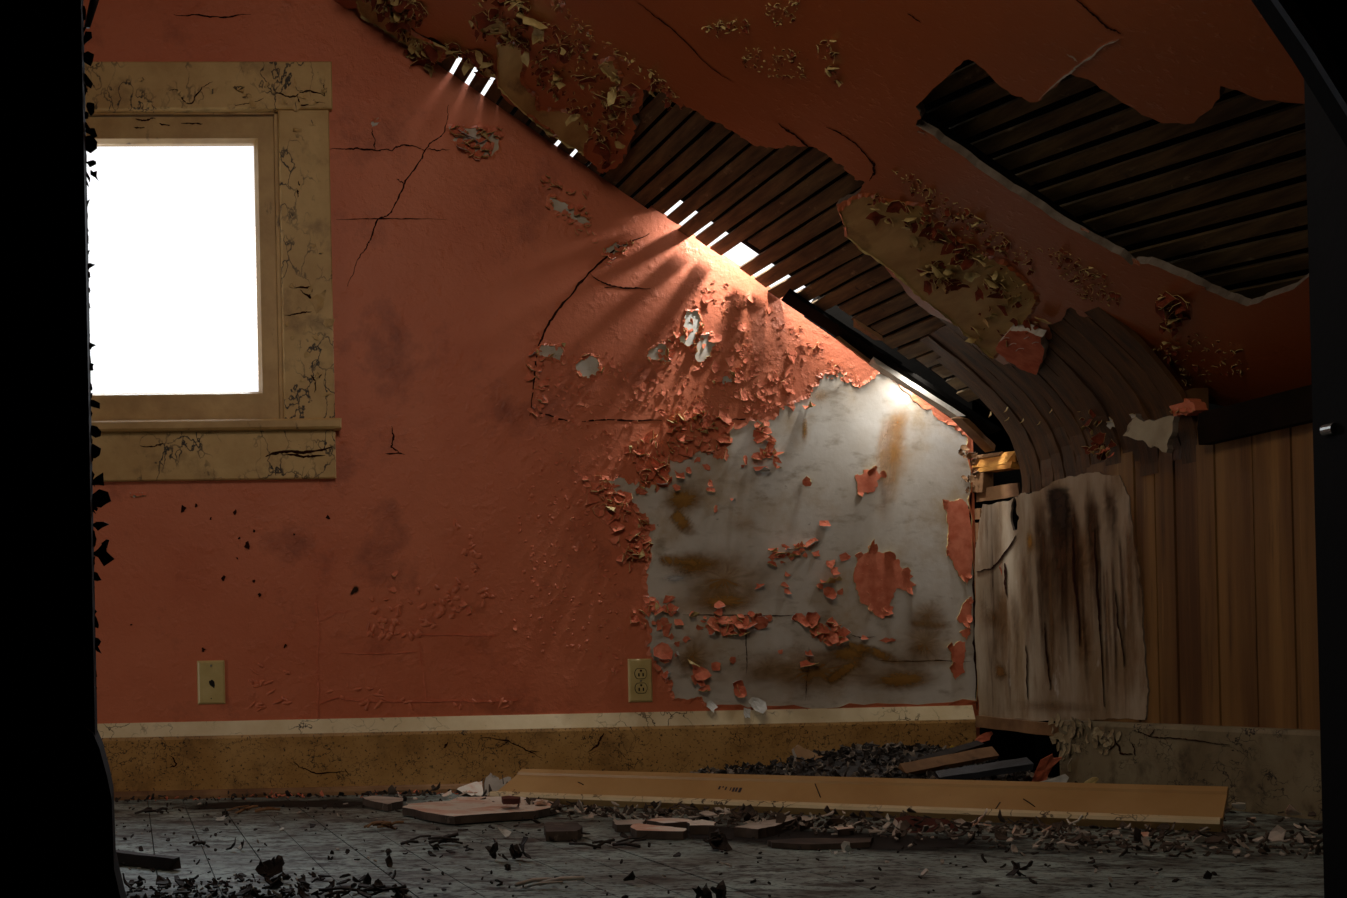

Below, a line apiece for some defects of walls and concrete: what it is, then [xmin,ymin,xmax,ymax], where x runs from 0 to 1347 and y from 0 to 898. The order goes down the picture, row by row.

crack [1039,0,1121,100]
crack [332,105,449,286]
flaking render [921,62,1309,299]
crack [288,286,312,316]
flaking render [355,0,1051,718]
peeling [1153,291,1250,386]
leakage [762,641,925,688]
leakage [974,472,1150,721]